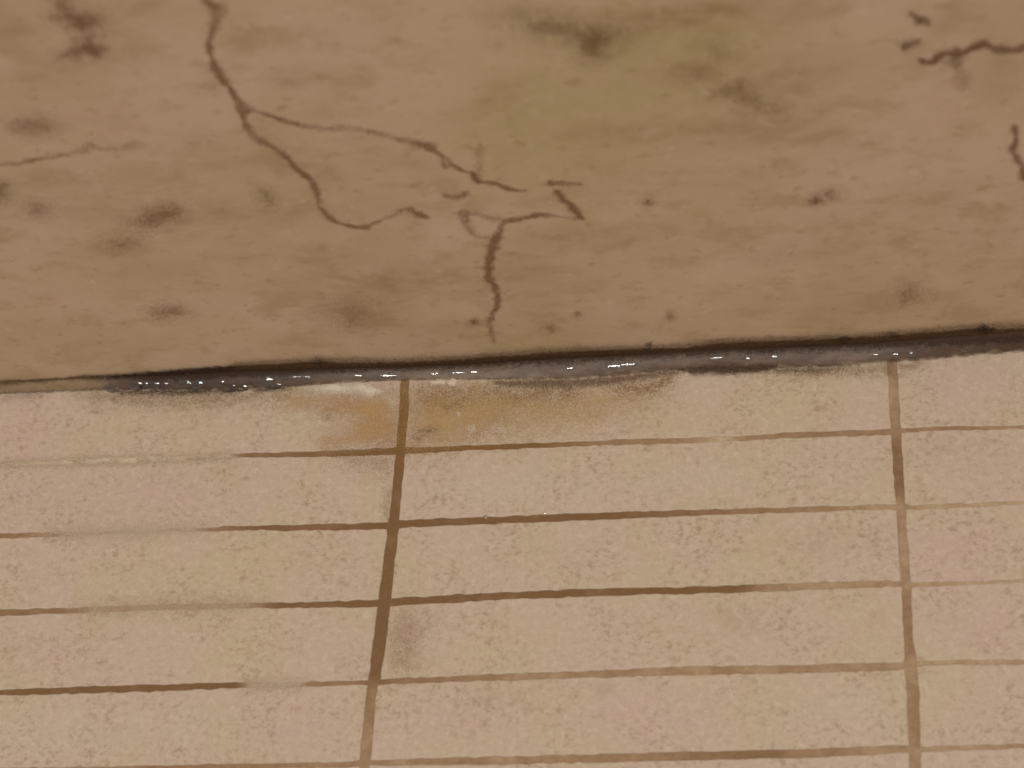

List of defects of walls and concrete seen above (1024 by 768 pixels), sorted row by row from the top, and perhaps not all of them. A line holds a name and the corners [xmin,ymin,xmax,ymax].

crack [899,11,1024,91]
crack [199,0,585,341]
damp [0,322,1024,414]